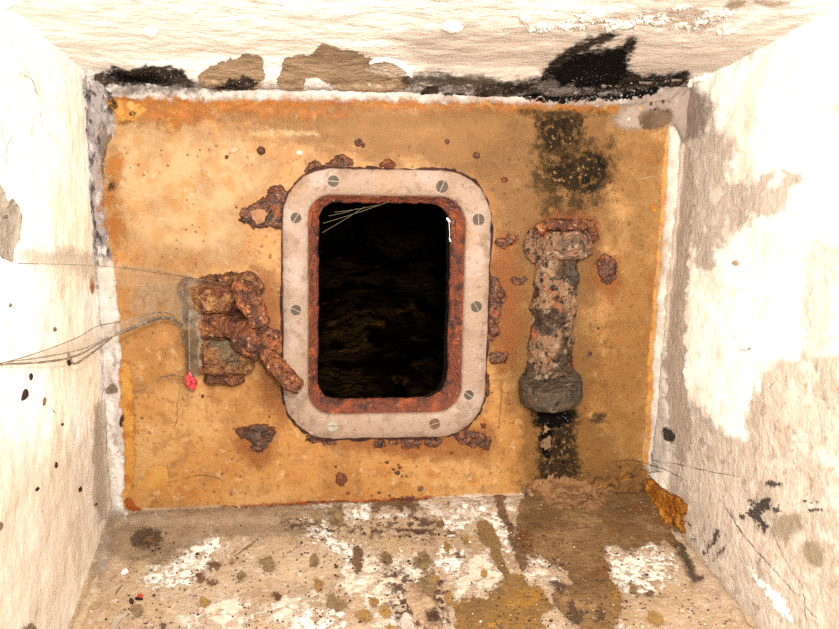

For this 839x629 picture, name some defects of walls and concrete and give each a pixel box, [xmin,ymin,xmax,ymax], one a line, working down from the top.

leakage [94,64,217,97]
peeling [197,54,266,92]
peeling [276,44,413,94]
leakage [402,0,805,97]
flaking render [0,183,23,262]
corrosion [176,276,196,327]
corrosion [216,271,238,282]
corrosion [235,154,539,453]
leakage [412,95,839,629]